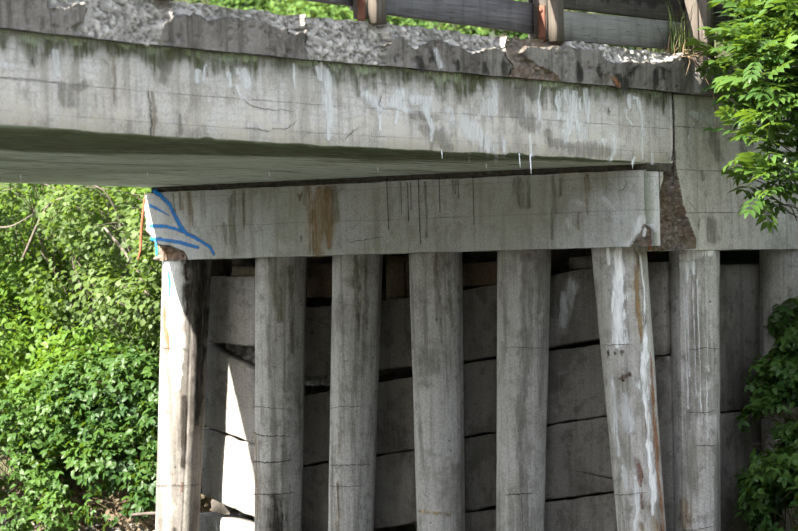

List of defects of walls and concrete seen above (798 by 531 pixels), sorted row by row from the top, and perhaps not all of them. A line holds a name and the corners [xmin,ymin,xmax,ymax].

spalling [45,0,684,81]
water stain [315,62,332,140]
water stain [366,89,453,151]
water stain [617,65,643,164]
spalling [153,244,188,261]
rust [297,186,333,256]
water stain [606,247,628,349]
spalling [630,136,696,251]
water stain [679,219,716,305]
water stain [162,260,210,467]
water stain [636,257,657,516]
rust [645,352,663,512]